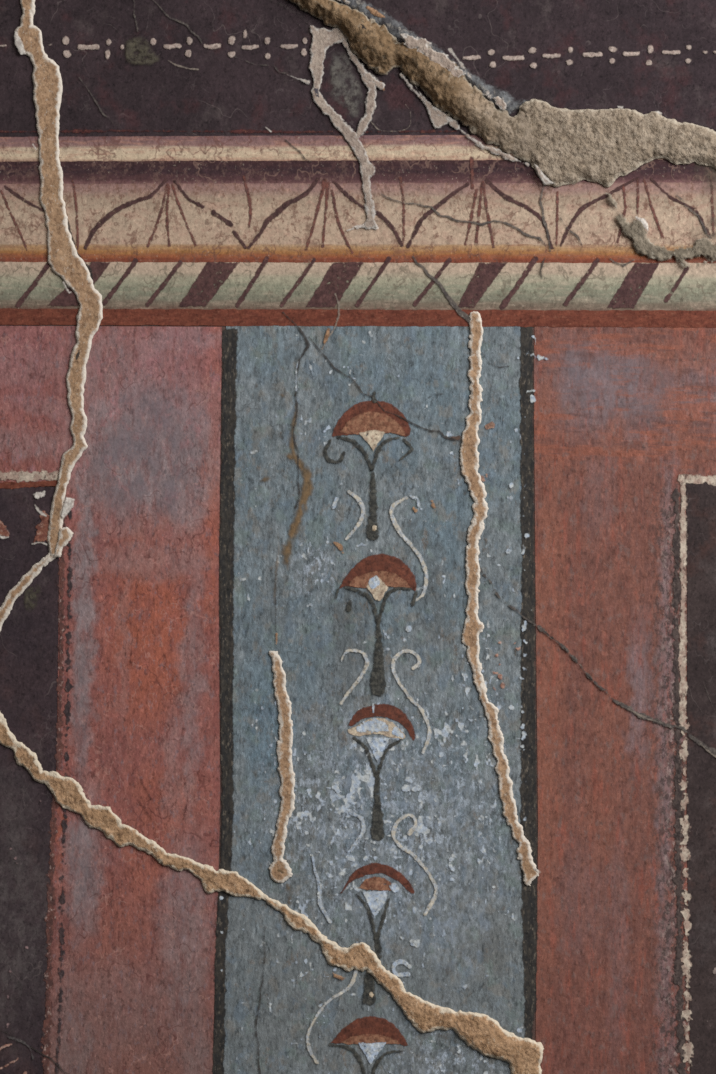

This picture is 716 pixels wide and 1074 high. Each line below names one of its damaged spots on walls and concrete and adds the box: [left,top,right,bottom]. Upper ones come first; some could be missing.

crack [0,0,107,631]
crack [0,598,544,1074]
crack [236,0,716,277]
crack [282,256,716,886]